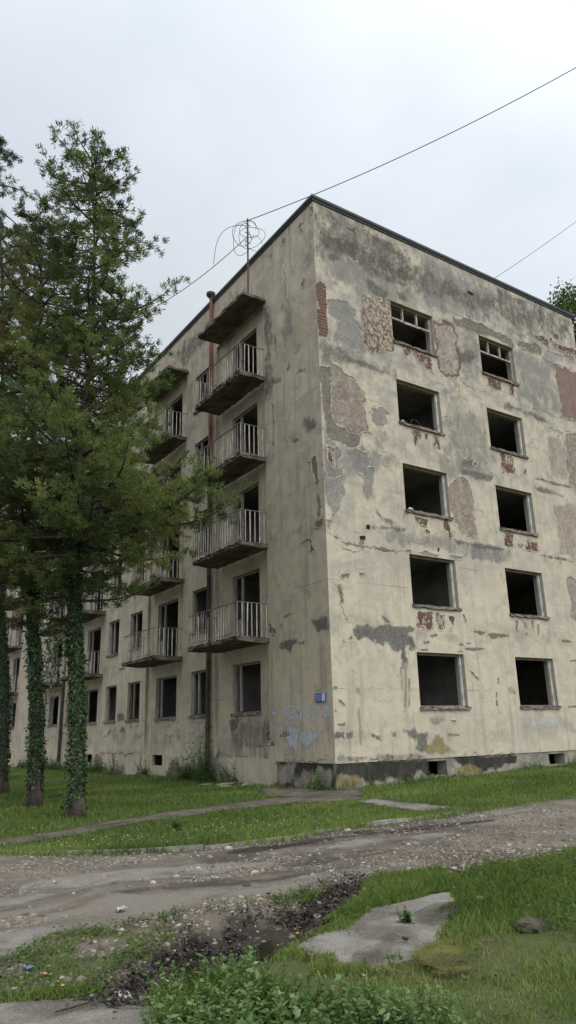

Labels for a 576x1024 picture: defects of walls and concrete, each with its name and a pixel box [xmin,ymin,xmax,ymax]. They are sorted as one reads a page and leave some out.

peeling [300,277,576,489]
peeling [301,362,392,552]
peeling [407,475,478,561]
damp [350,615,438,689]
peeling [415,610,467,632]
damp [277,718,440,790]
damp [455,755,517,773]